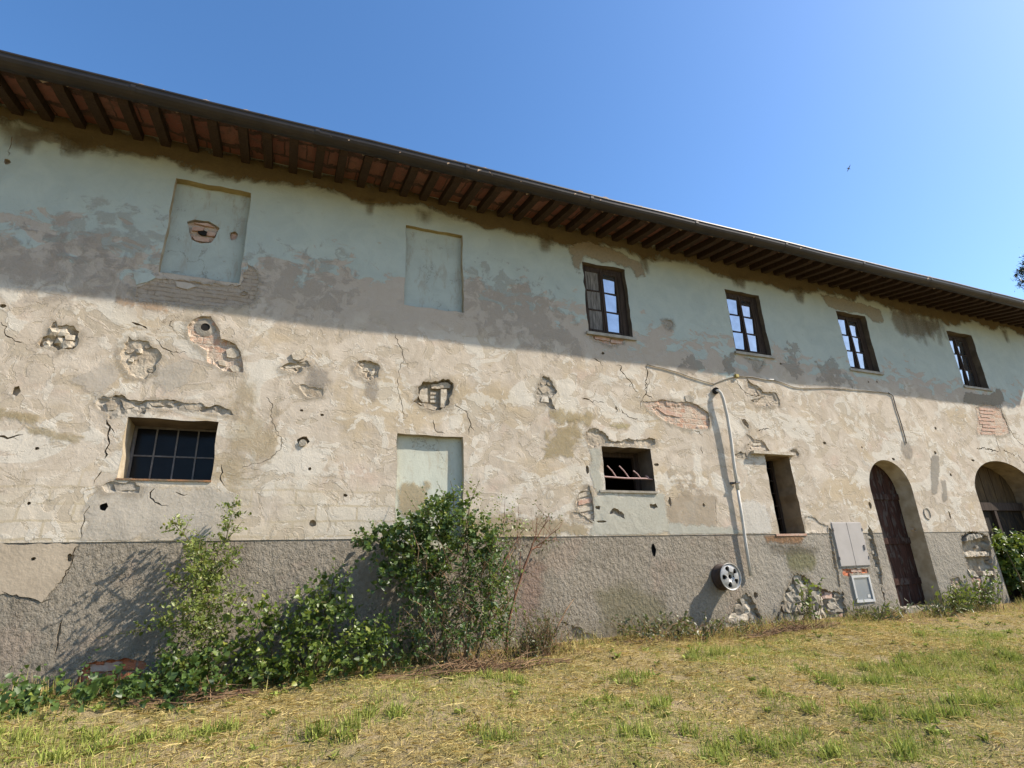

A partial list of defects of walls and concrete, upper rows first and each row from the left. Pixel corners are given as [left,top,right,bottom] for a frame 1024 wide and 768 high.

spalling [187,220,238,243]
spalling [38,321,79,351]
spalling [133,265,259,372]
spalling [120,337,162,380]
spalling [96,394,233,420]
spalling [413,379,454,411]
crack [582,358,653,419]
spalling [643,395,710,430]
spalling [976,405,1010,435]
spalling [572,466,624,523]
crack [4,420,115,655]
spalling [726,516,883,627]